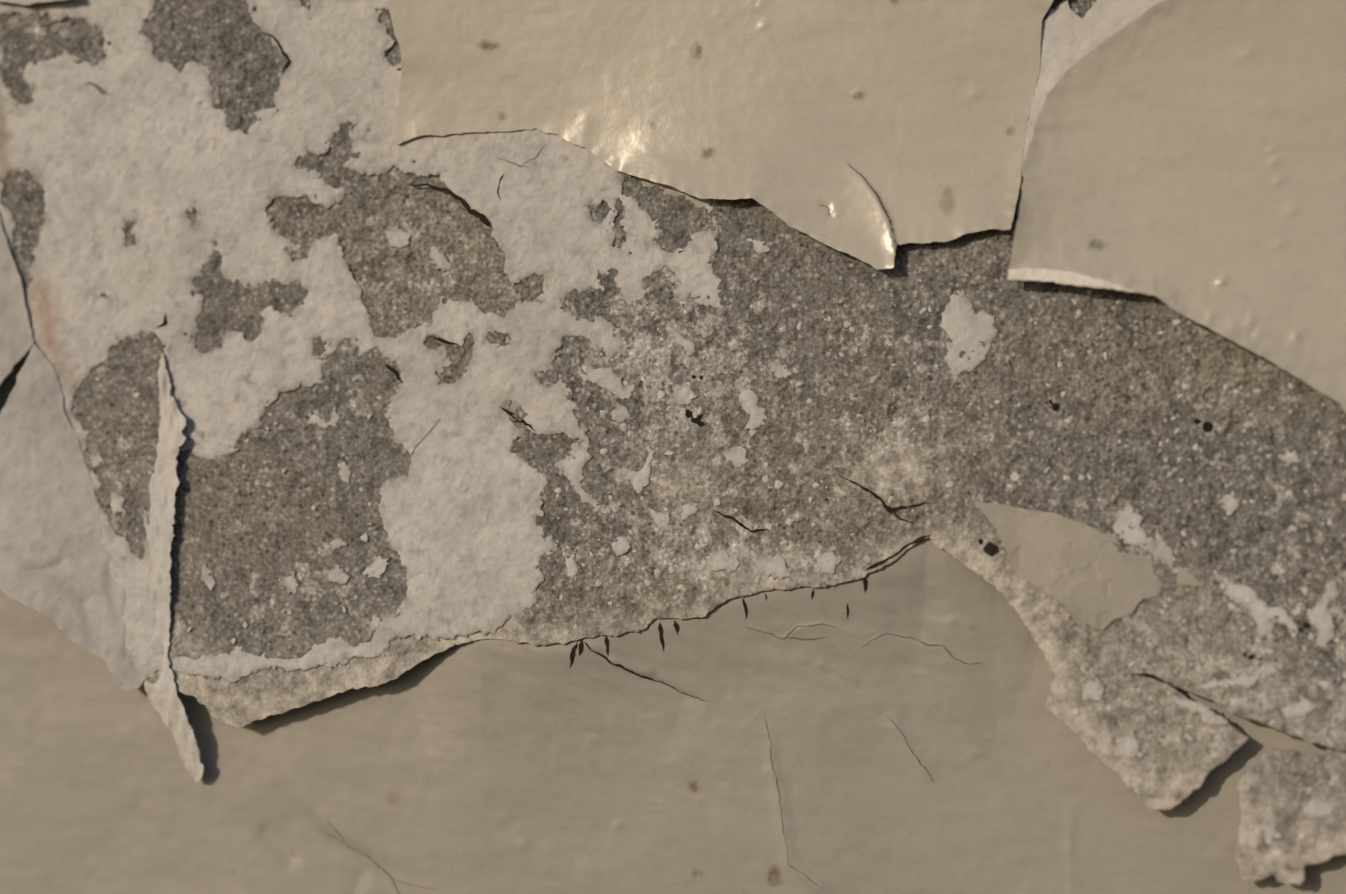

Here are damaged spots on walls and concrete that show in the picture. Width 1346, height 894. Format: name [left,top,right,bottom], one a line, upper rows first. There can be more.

spalling [0,0,112,109]
spalling [138,0,288,134]
spalling [0,121,544,783]
spalling [376,0,1346,885]
crack [325,822,434,894]